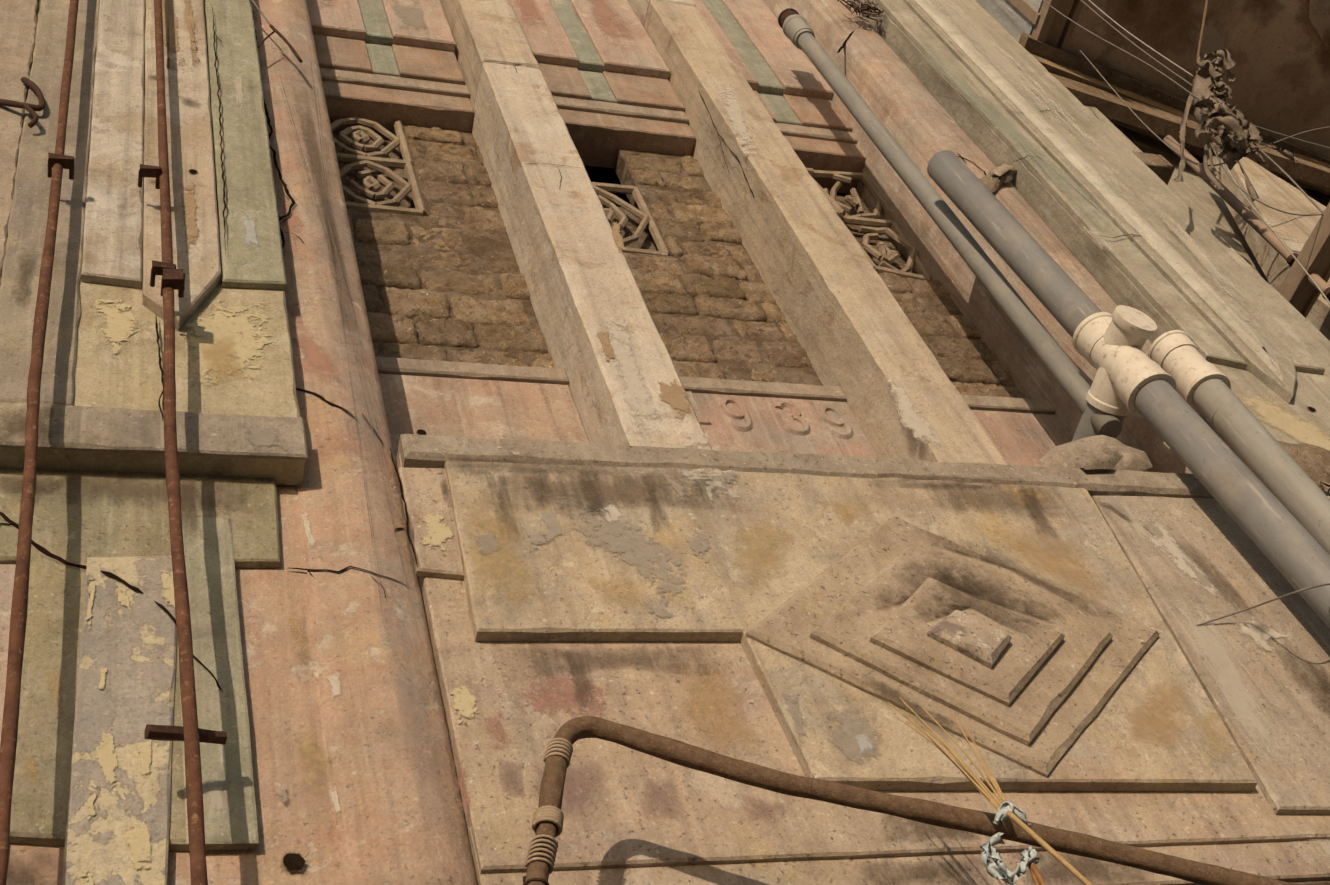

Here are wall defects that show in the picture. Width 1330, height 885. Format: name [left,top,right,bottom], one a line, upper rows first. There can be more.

crack [212,6,226,256]
crack [253,11,306,251]
peeling [612,221,626,253]
peeling [94,299,137,357]
peeling [182,299,274,386]
crack [0,511,177,626]
peeling [160,568,175,607]
crack [290,388,417,600]
peeling [406,512,453,561]
peeling [527,497,710,618]
crack [193,655,223,692]
peeling [87,727,118,820]